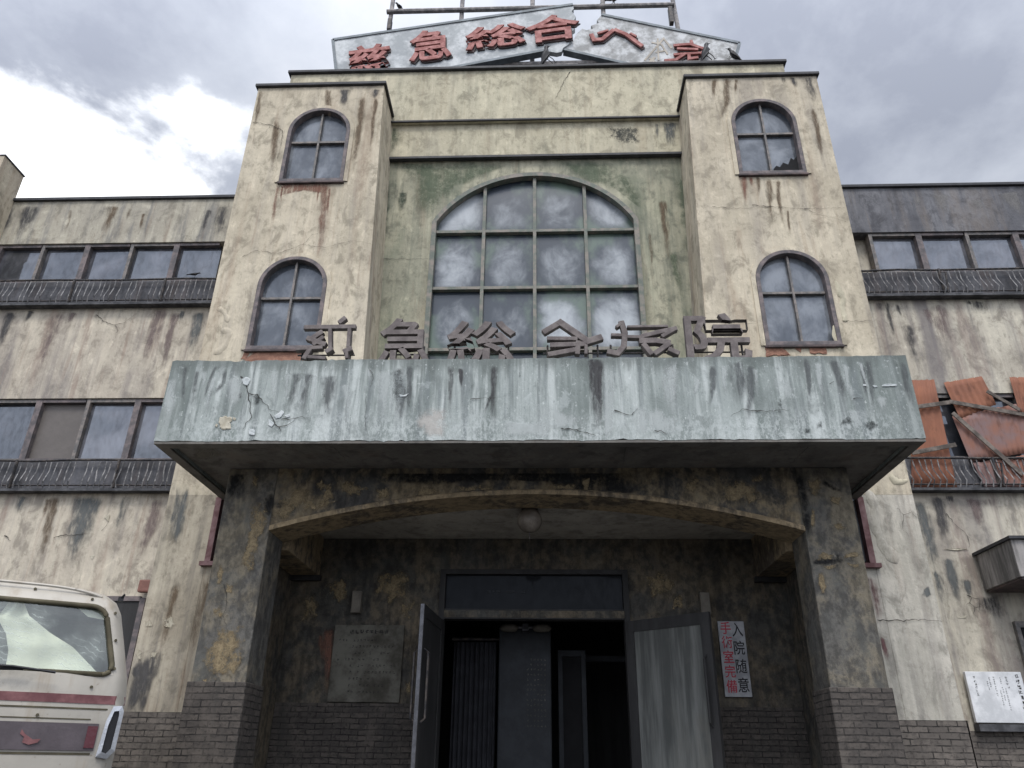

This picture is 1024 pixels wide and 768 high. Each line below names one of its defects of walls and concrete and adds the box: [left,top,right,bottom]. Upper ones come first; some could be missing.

water stain [5,207,37,228]
rust [274,184,330,225]
water stain [660,202,668,237]
crack [240,376,309,430]
water stain [368,368,412,412]
water stain [487,369,497,406]
water stain [590,359,614,434]
water stain [804,360,885,407]
water stain [68,498,100,553]
water stain [143,501,159,545]
water stain [171,491,188,537]
water stain [164,589,178,638]